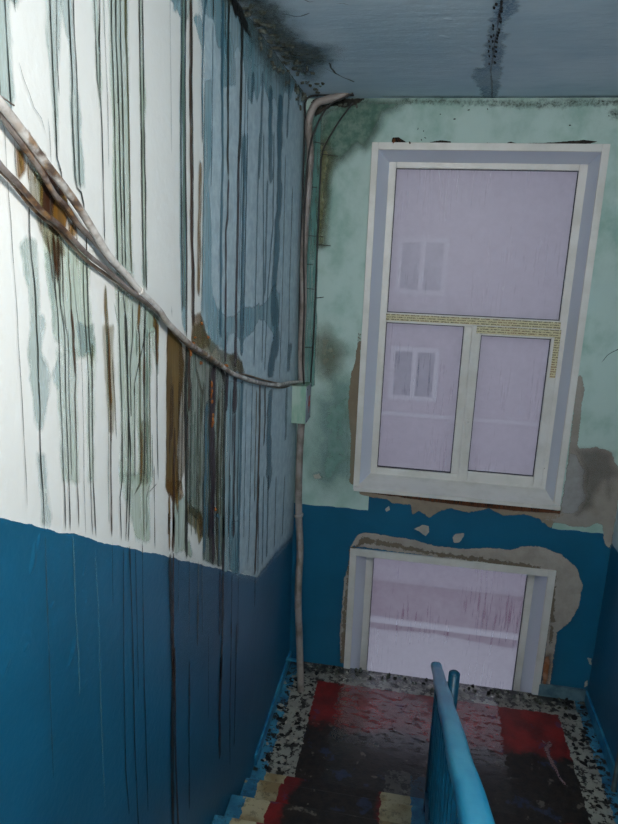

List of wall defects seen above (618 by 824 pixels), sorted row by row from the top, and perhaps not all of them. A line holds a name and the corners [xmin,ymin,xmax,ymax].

water stain [0,0,16,109]
water stain [50,0,85,209]
water stain [94,0,132,277]
water stain [139,0,147,289]
water stain [172,0,300,377]
crack [474,0,516,98]
water stain [24,208,48,528]
water stain [45,222,96,534]
corrosion [166,313,272,573]
flaking render [339,333,618,684]
water stain [123,546,148,824]
water stain [169,554,179,824]